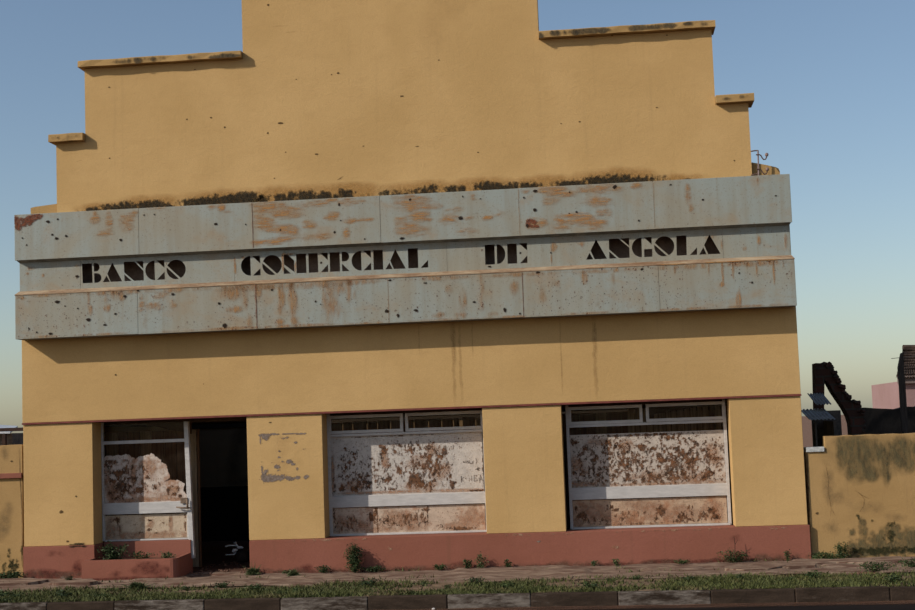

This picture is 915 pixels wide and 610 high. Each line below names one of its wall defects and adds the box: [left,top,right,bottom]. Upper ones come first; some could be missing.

damp [86,170,684,211]
peeling [259,422,306,444]
peeling [104,460,182,502]
peeling [261,450,309,482]
peeling [333,434,460,492]
peeling [570,432,726,486]
damp [837,436,915,481]
peeling [367,506,476,532]
peeling [575,504,721,532]